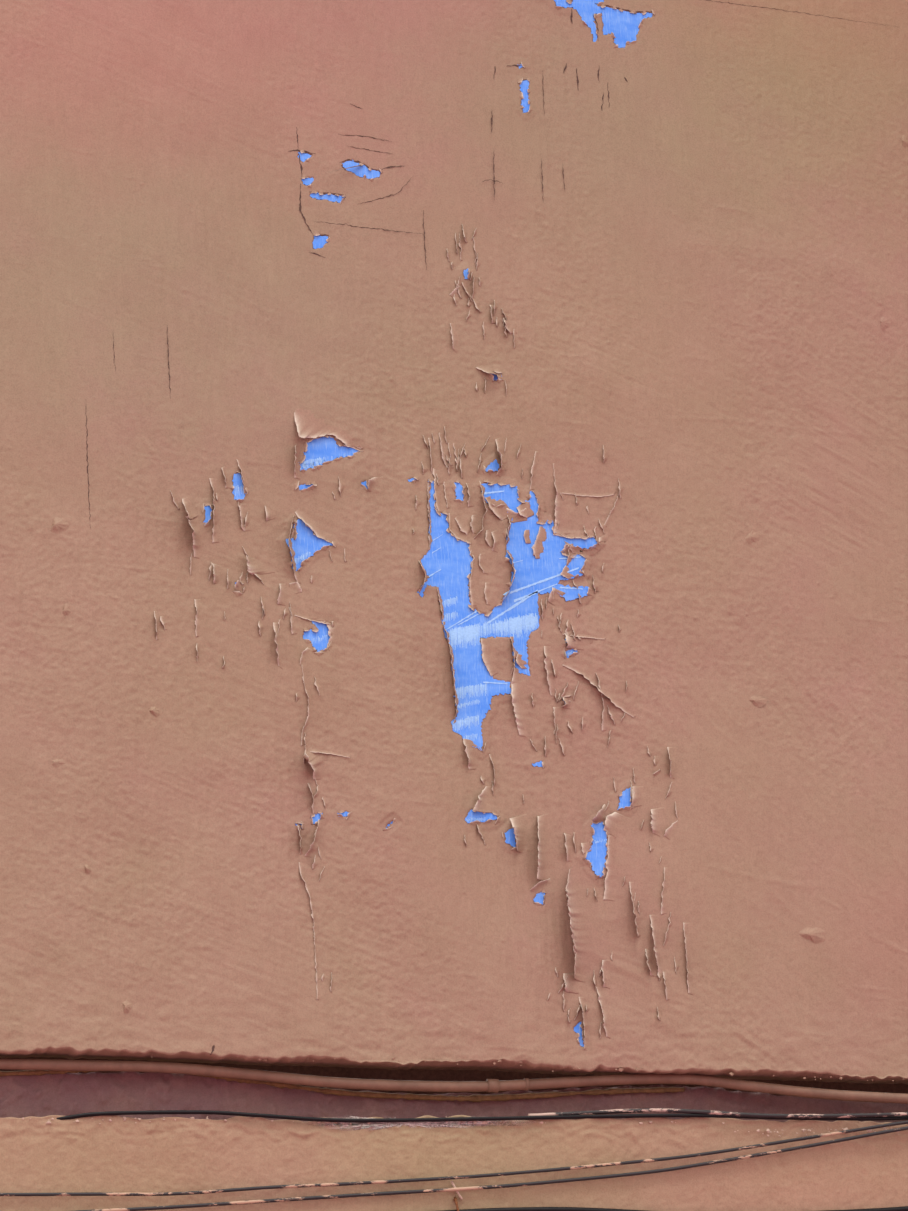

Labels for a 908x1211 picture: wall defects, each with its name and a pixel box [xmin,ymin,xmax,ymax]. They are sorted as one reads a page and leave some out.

peeling [554,0,656,48]
peeling [517,62,533,113]
crack [494,63,628,113]
peeling [297,150,346,204]
peeling [330,159,383,182]
peeling [313,231,331,249]
peeling [447,224,517,353]
peeling [476,366,508,395]
peeling [294,409,363,492]
peeling [170,460,352,1000]
peeling [408,426,694,1051]